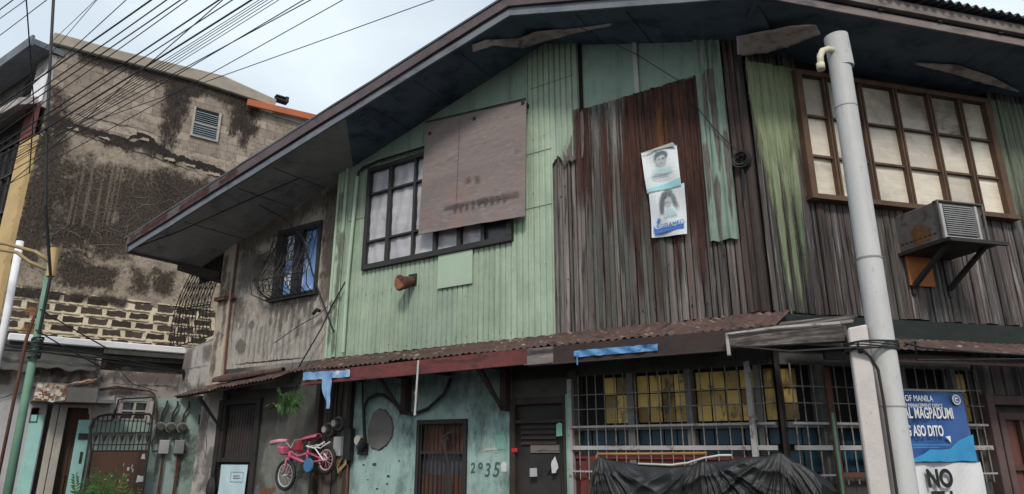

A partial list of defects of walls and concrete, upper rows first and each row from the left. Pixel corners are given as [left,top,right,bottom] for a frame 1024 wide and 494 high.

damp [11,85,210,296]
flaking render [44,116,226,177]
damp [78,53,262,149]